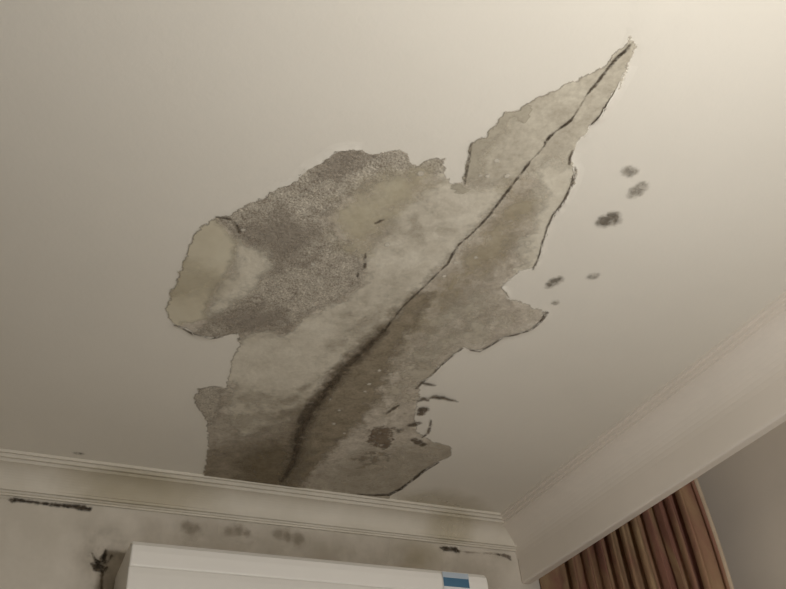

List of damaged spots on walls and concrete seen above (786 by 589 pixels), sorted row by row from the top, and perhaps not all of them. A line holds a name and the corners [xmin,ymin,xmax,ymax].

crack [544,45,631,146]
flaking render [165,37,638,499]
crack [281,162,530,482]
damp [397,396,455,446]
damp [9,498,91,511]